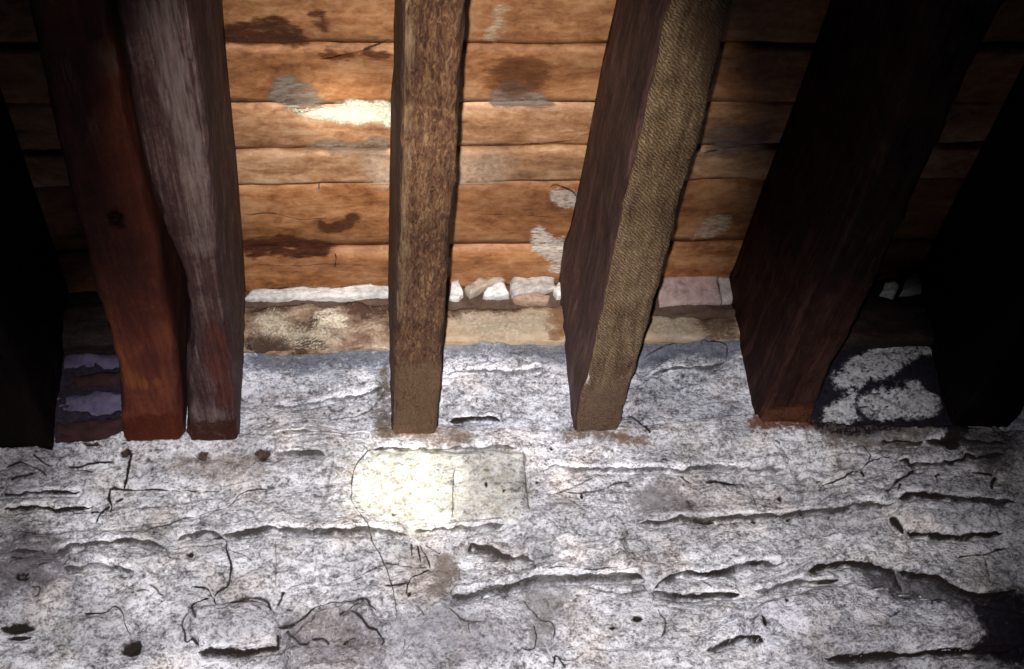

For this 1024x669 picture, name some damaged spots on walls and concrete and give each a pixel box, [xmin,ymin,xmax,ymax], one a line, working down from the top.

leakage [224,16,306,46]
leakage [286,100,391,127]
leakage [243,213,360,260]
leakage [531,228,564,273]
spalling [255,449,271,462]
crack [7,450,269,550]
crack [10,520,56,603]
crack [181,441,481,650]
spalling [1,623,35,641]
crack [84,584,165,636]
spalling [122,641,142,657]
spalling [863,560,1024,668]